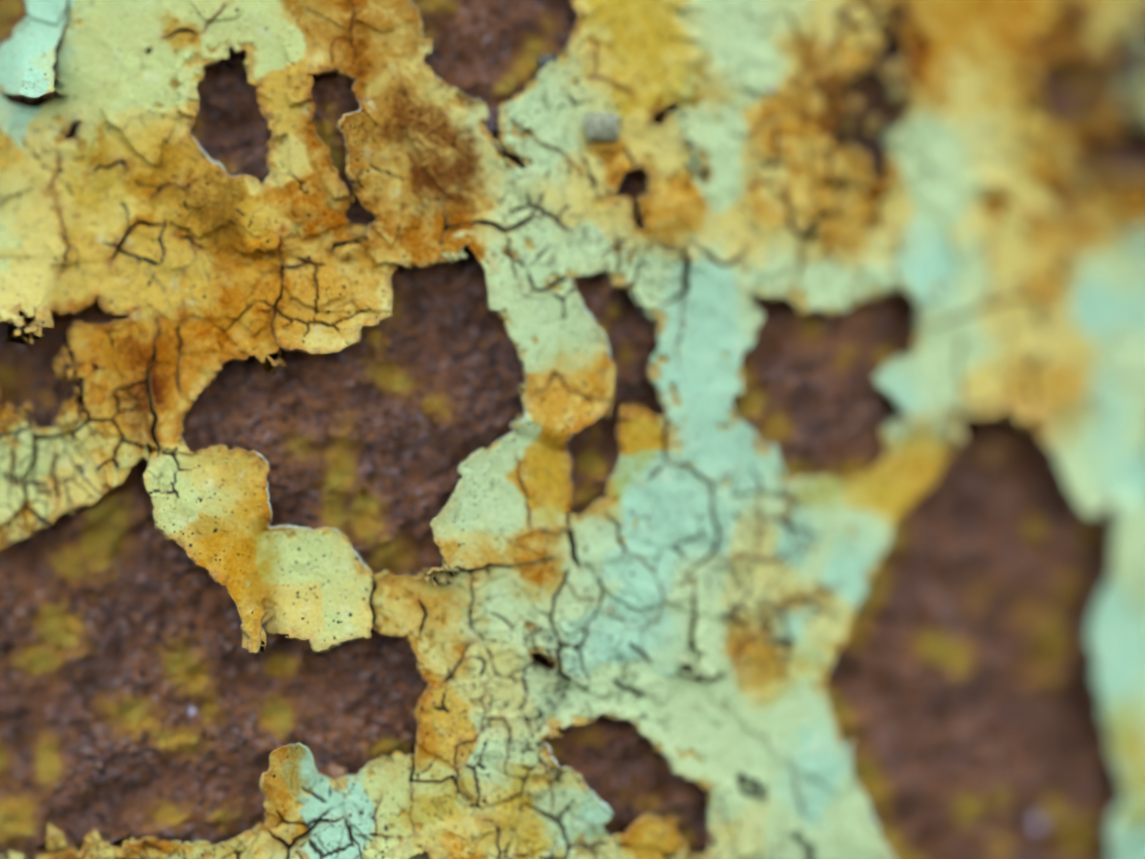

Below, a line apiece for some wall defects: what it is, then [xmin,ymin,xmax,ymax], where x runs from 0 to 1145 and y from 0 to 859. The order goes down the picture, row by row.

crack [109,180,202,261]
peeling [191,47,272,184]
crack [257,238,347,339]
peeling [311,71,410,234]
peeling [411,0,578,169]
crack [440,206,567,293]
peeling [615,168,649,231]
peeling [0,194,745,859]
crack [443,451,663,682]
peeling [683,215,1145,859]
rust [327,763,347,779]
crack [269,688,512,859]